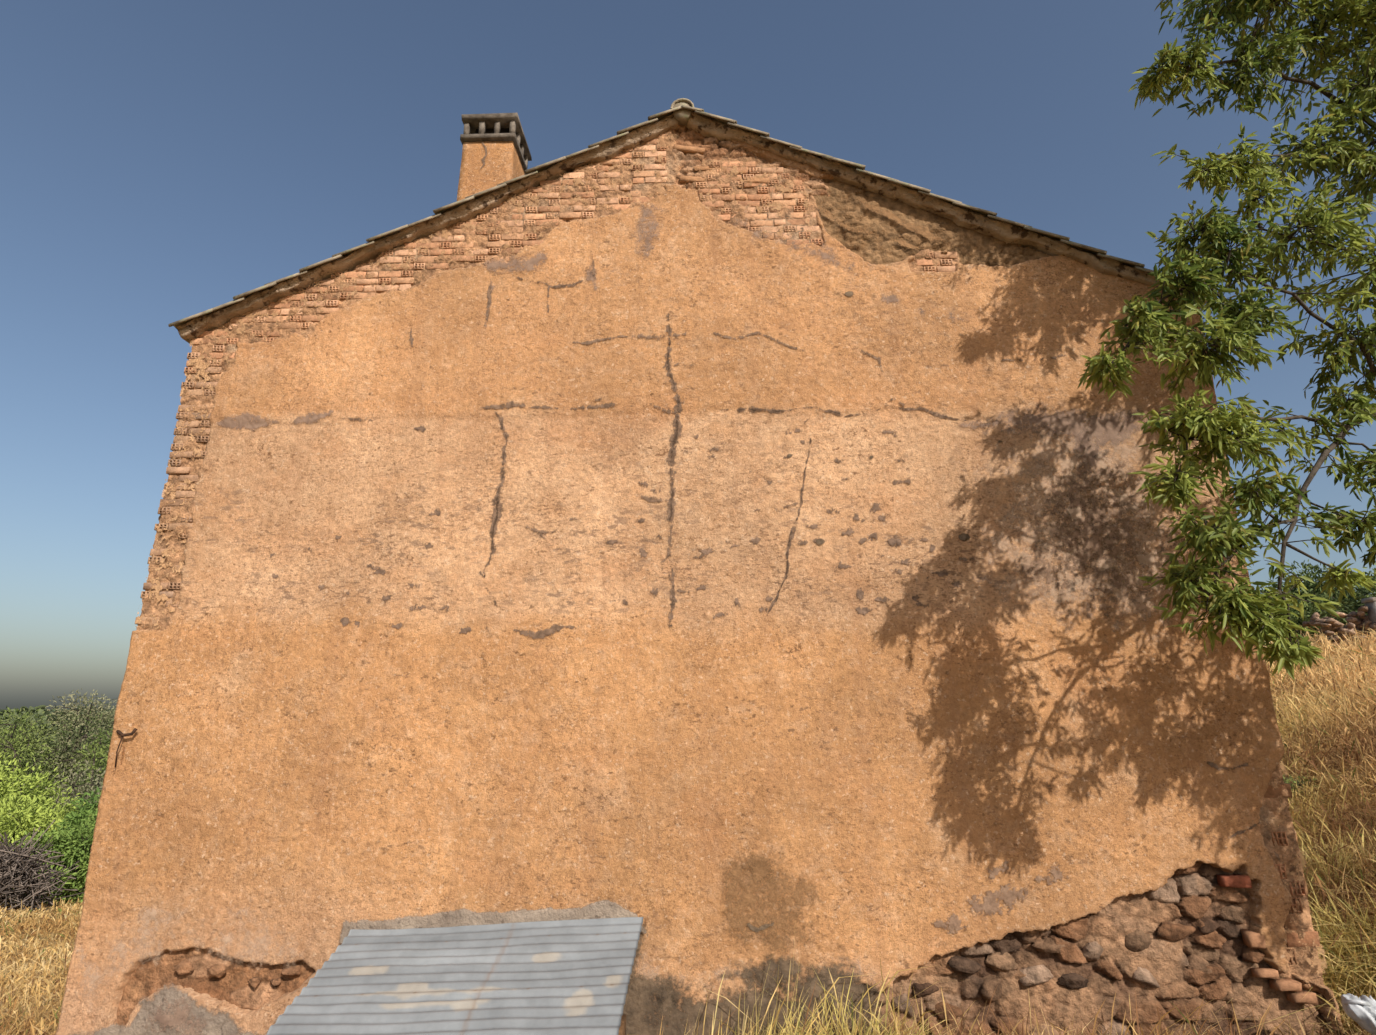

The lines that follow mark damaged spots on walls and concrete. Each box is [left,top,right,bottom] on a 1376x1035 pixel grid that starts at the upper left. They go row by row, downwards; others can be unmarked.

crack [486,251,596,321]
crack [479,397,615,639]
flaking render [135,125,1051,631]
crack [573,313,804,627]
crack [726,350,966,615]
flaking render [116,948,315,1026]
water stain [623,853,886,1035]
flaking render [861,761,1331,1035]